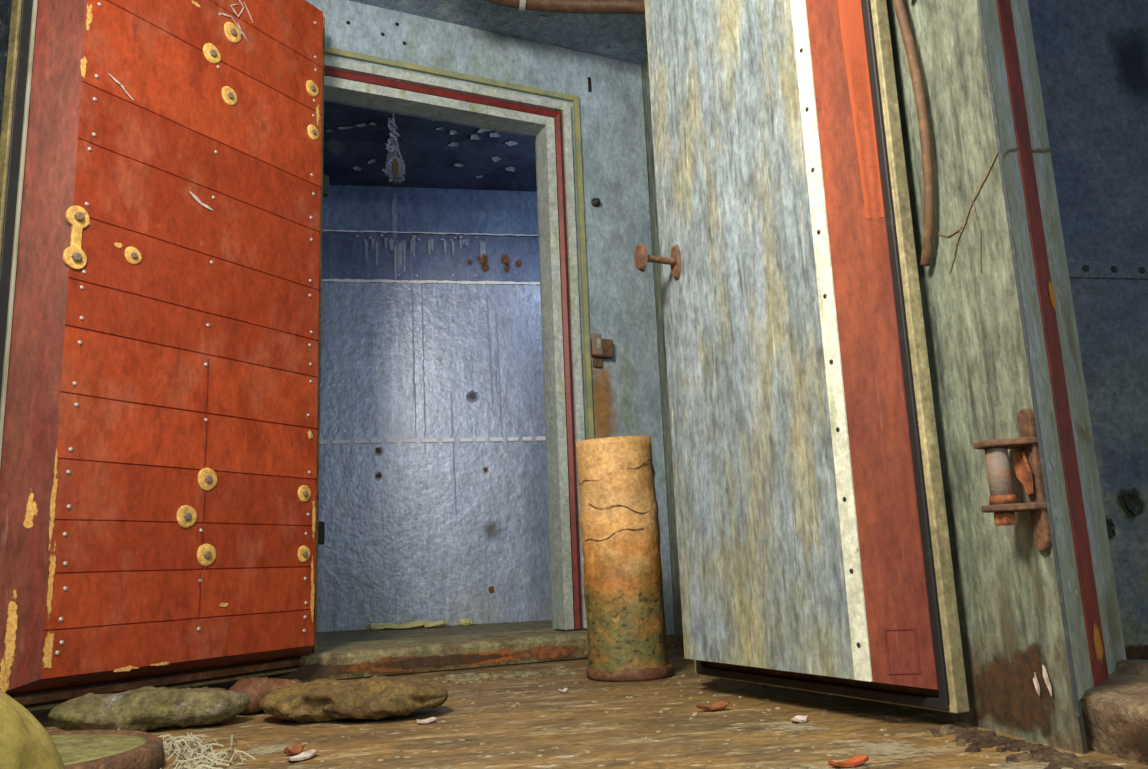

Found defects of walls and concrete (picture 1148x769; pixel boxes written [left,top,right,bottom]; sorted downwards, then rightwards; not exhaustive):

corrosion [261,645,577,680]